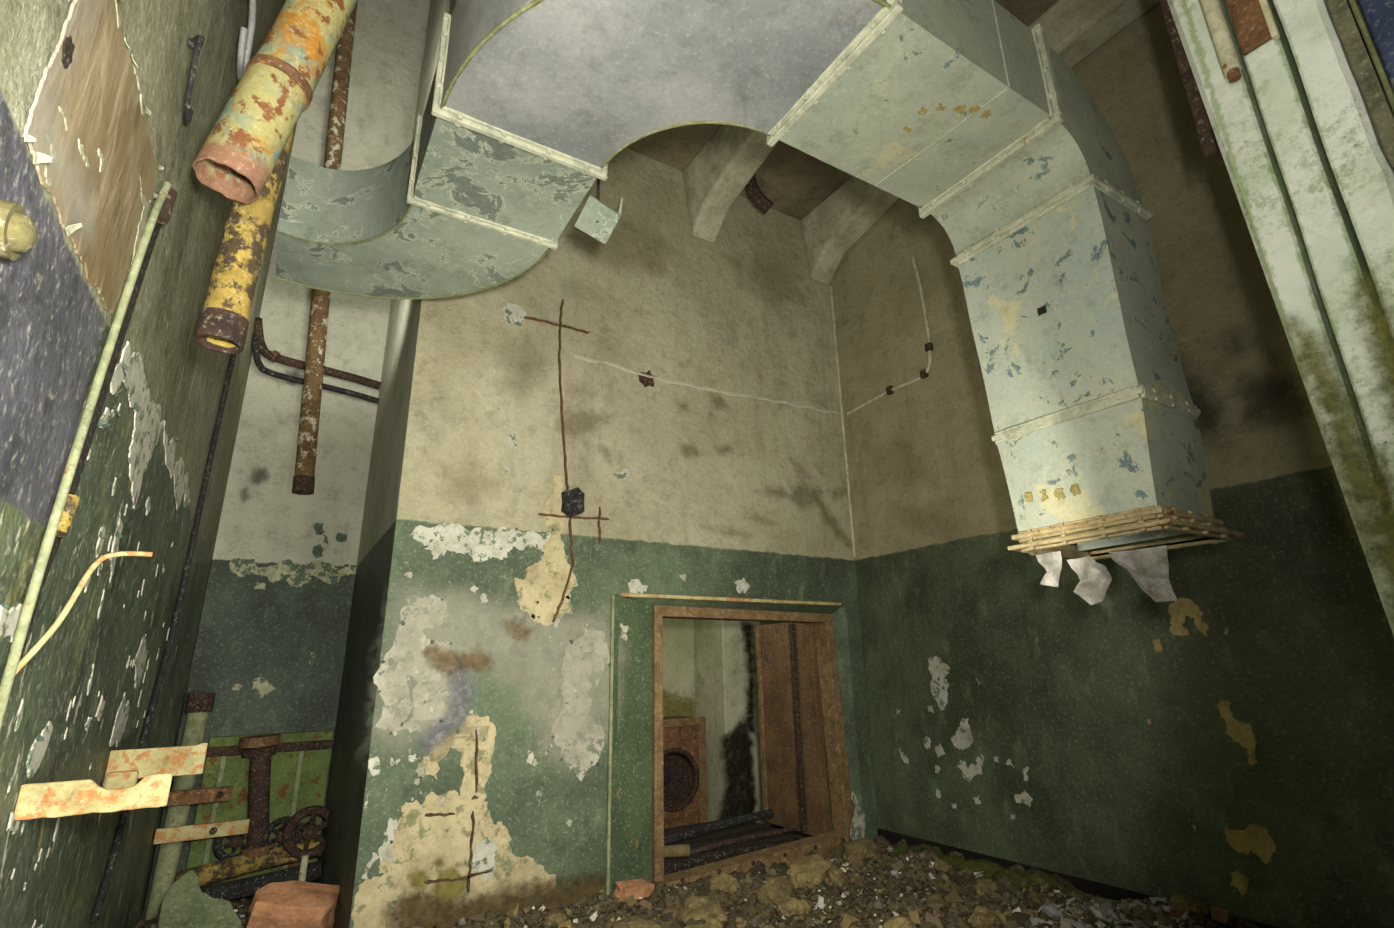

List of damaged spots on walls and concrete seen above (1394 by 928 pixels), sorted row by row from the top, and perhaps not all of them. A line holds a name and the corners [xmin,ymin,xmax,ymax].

damp [1357,277,1394,414]
peeling [84,341,192,619]
damp [1291,325,1394,607]
peeling [229,523,357,592]
peeling [405,299,633,785]
peeling [1153,597,1229,652]
peeling [231,677,292,699]
peeling [927,656,950,713]
spalling [351,572,556,928]
peeling [924,718,1033,820]
peeling [11,817,60,891]
peeling [1225,824,1277,898]